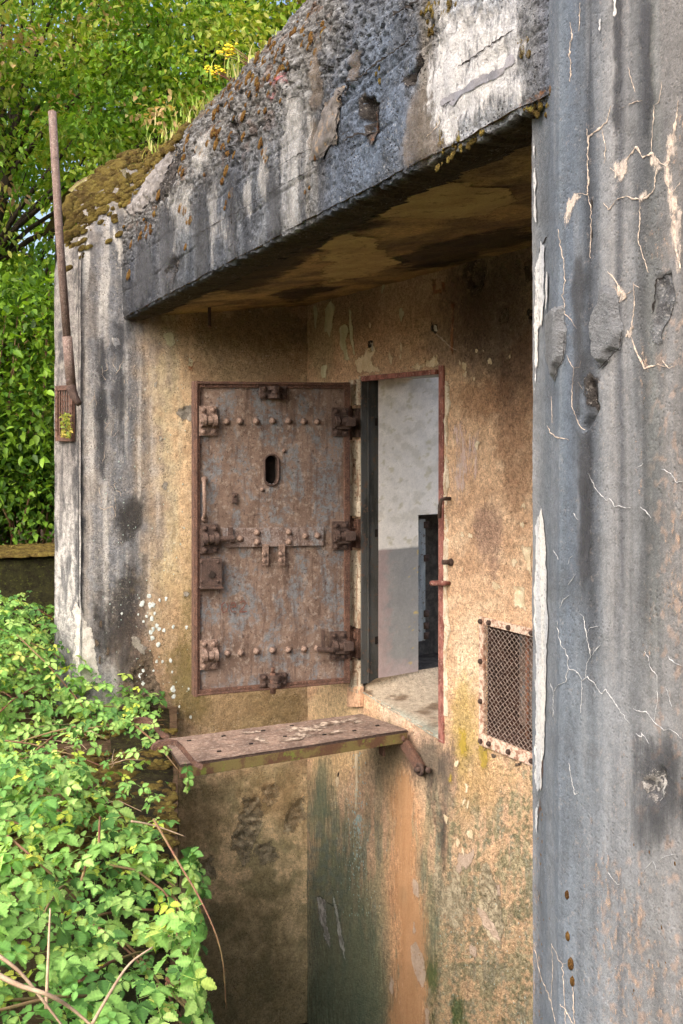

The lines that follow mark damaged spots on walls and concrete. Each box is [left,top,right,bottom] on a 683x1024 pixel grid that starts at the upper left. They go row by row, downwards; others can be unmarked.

peeling [309,76,349,161]
spalling [358,88,380,145]
water stain [192,187,208,274]
water stain [263,170,279,236]
water stain [212,208,390,303]
water stain [391,227,532,271]
crack [548,68,681,439]
spalling [650,244,676,345]
water stain [95,322,129,478]
spalling [583,373,600,413]
crack [550,550,682,742]
spalling [642,769,668,803]